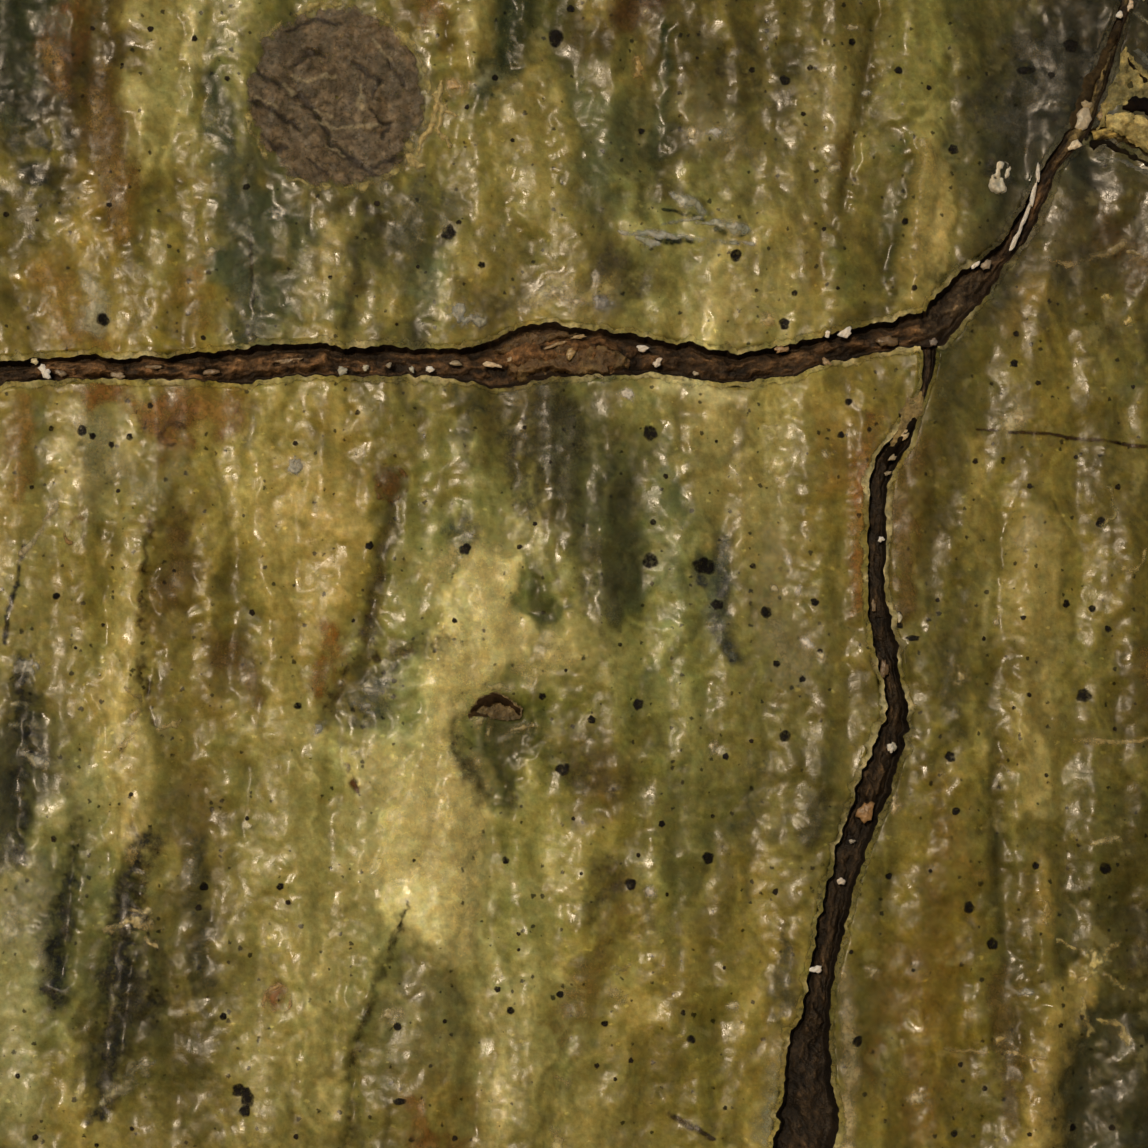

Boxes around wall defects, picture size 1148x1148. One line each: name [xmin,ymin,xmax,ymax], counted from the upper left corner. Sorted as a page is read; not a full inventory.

crack [0,0,1148,448]
crack [3,545,26,644]
hole [468,682,534,736]
crack [768,140,1087,1148]
leakage [86,833,164,1125]
leakage [182,837,217,988]
crack [348,985,373,1078]